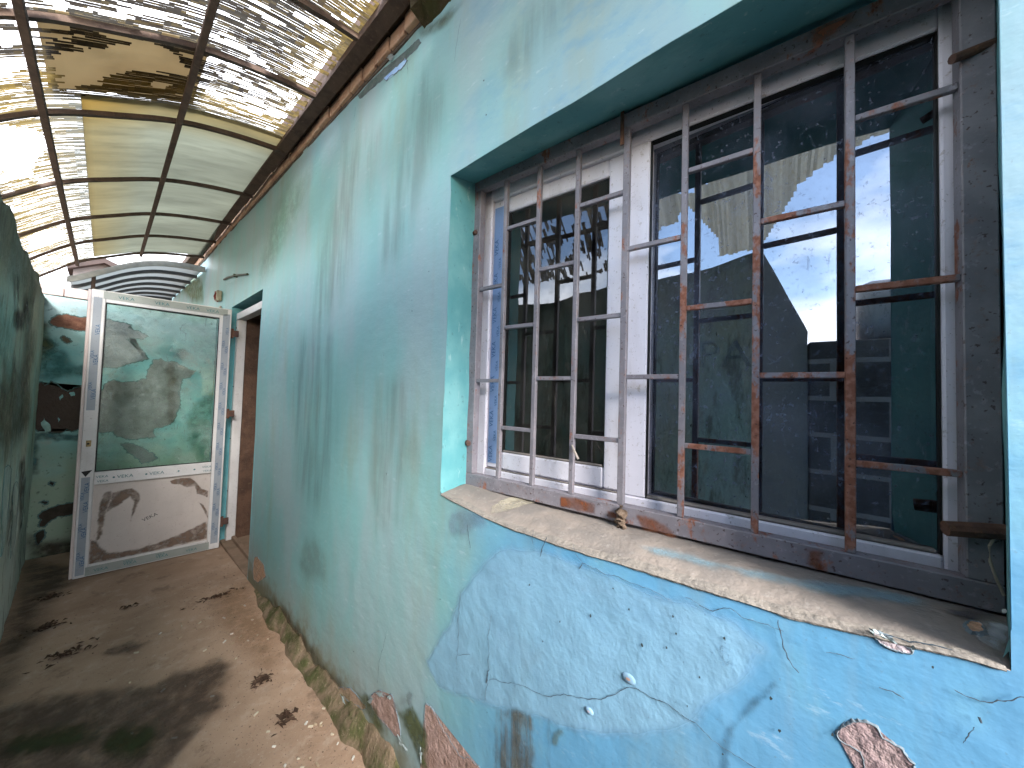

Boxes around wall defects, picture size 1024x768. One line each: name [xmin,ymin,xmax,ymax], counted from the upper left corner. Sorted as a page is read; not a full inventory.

spalling [35,380,82,434]
spalling [33,500,74,545]
corrosion [560,497,593,512]
crack [456,594,755,768]
spalling [338,686,480,768]
spalling [831,718,916,768]